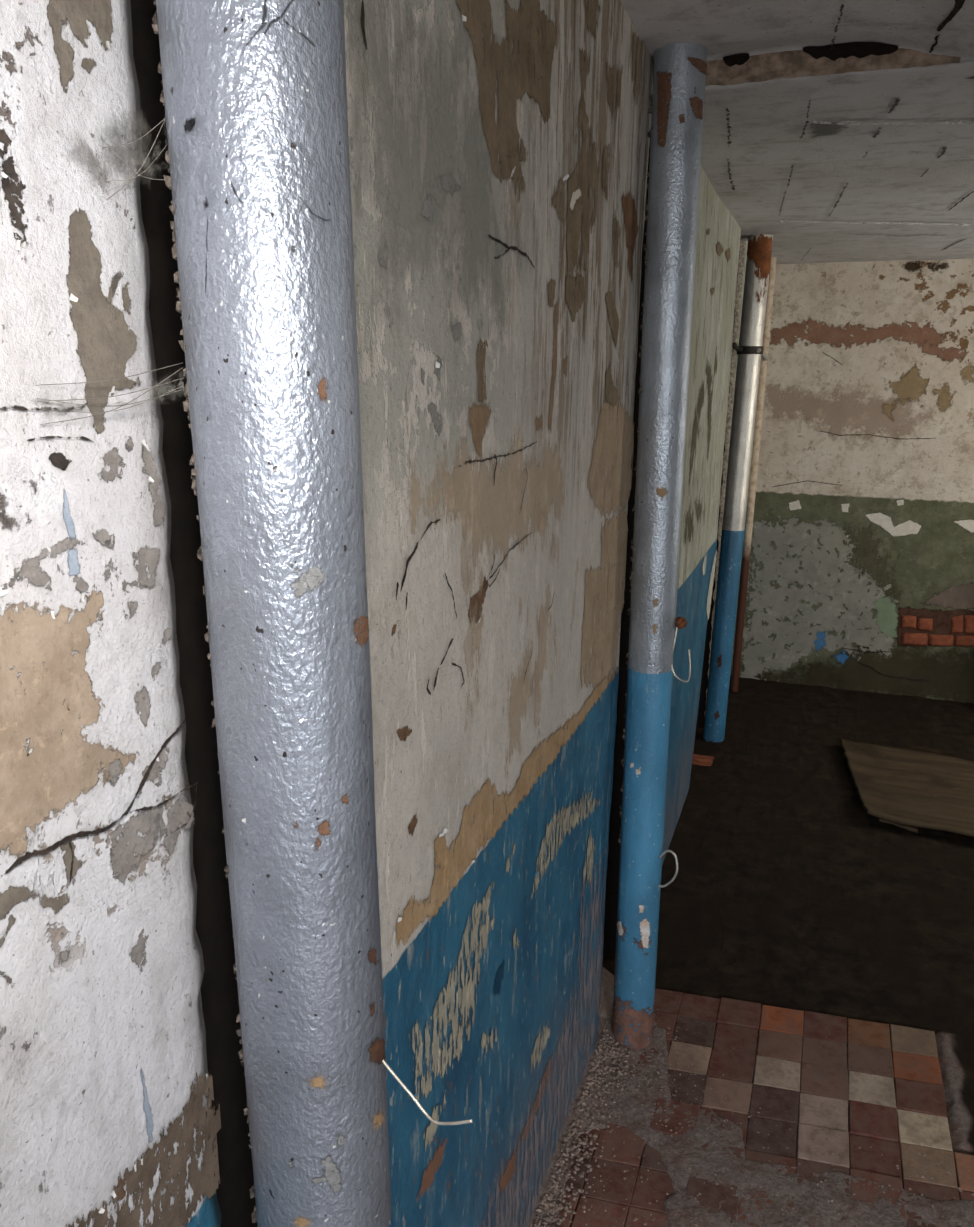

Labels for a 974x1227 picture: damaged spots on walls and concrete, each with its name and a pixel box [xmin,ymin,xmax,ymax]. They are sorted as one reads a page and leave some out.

peeling [457,0,557,202]
rust [657,71,703,147]
rust [685,56,707,76]
peeling [66,208,137,434]
rust [747,234,773,301]
crack [454,441,537,587]
peeling [0,528,170,858]
peeling [396,362,634,949]
crack [1,720,198,882]
peeling [0,841,85,948]
rust [612,996,655,1049]
peeling [66,1072,221,1227]